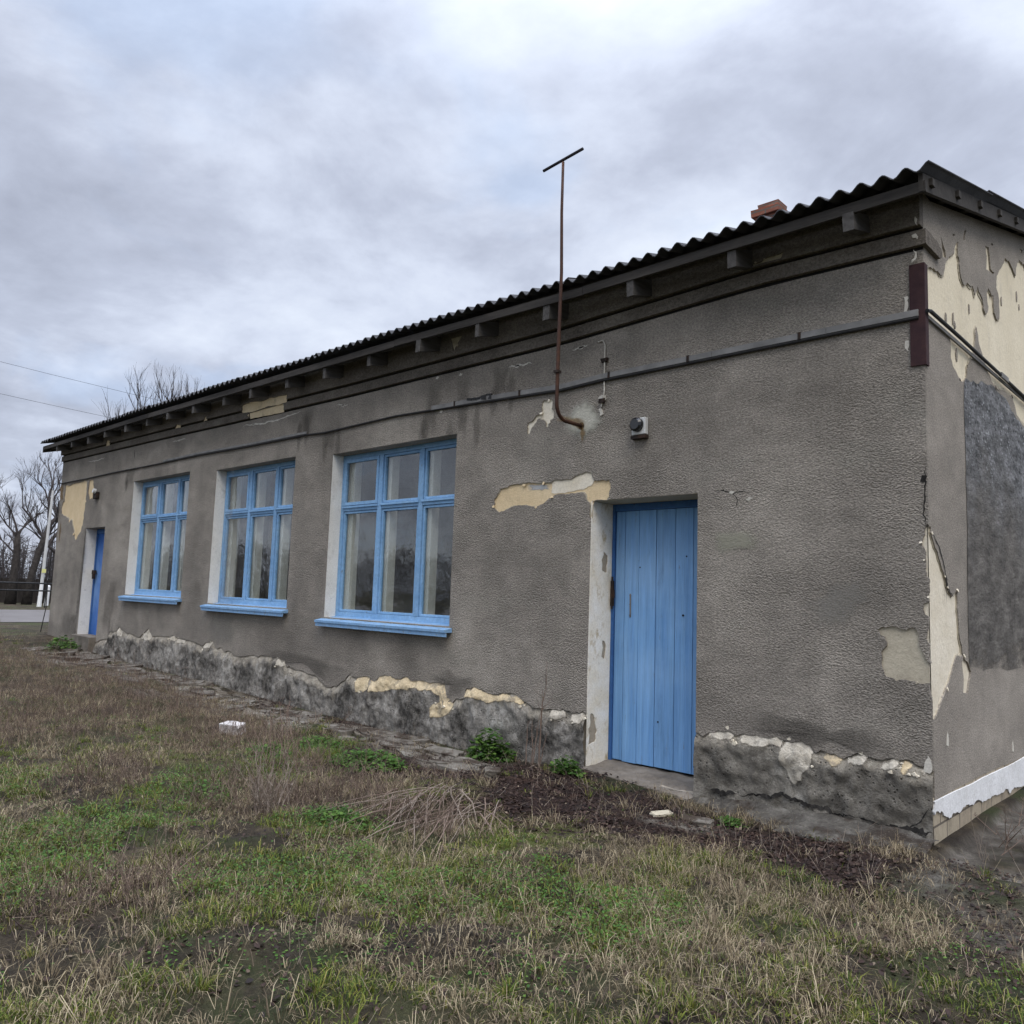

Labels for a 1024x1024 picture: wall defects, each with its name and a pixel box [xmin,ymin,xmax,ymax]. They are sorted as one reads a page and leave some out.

peeling [928,244,1024,426]
peeling [242,395,301,426]
peeling [528,399,554,434]
peeling [62,480,94,540]
peeling [492,472,611,518]
crack [920,467,954,602]
spalling [878,525,969,719]
spalling [709,726,868,784]
spalling [881,756,932,778]